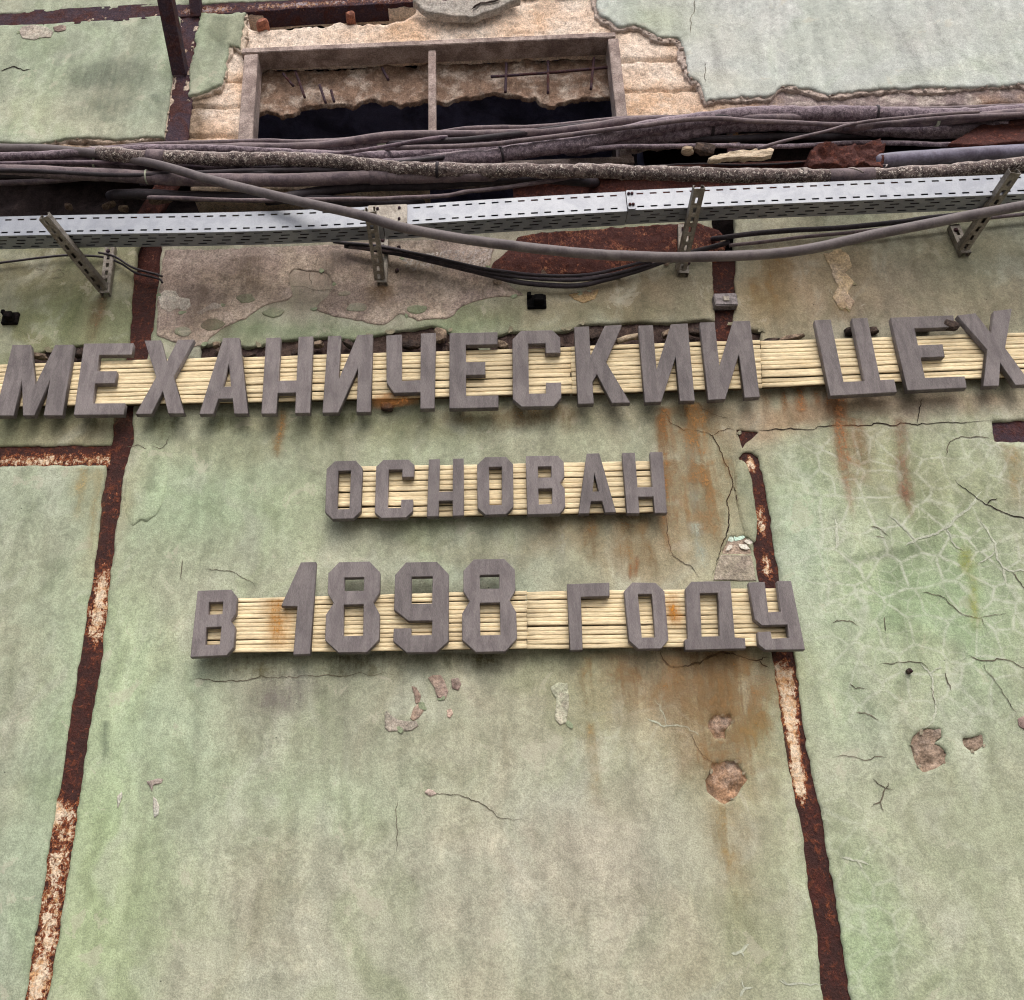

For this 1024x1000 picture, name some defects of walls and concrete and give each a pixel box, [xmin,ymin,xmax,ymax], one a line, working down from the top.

corrosion [491,223,726,285]
peeling [156,240,523,358]
spalling [557,320,604,352]
spalling [614,324,670,345]
crack [765,400,988,456]
crack [660,403,738,577]
crack [955,480,1024,518]
peeling [714,535,756,581]
crack [971,656,1024,712]
spalling [910,728,946,772]
spalling [705,759,747,804]
crack [834,755,893,812]